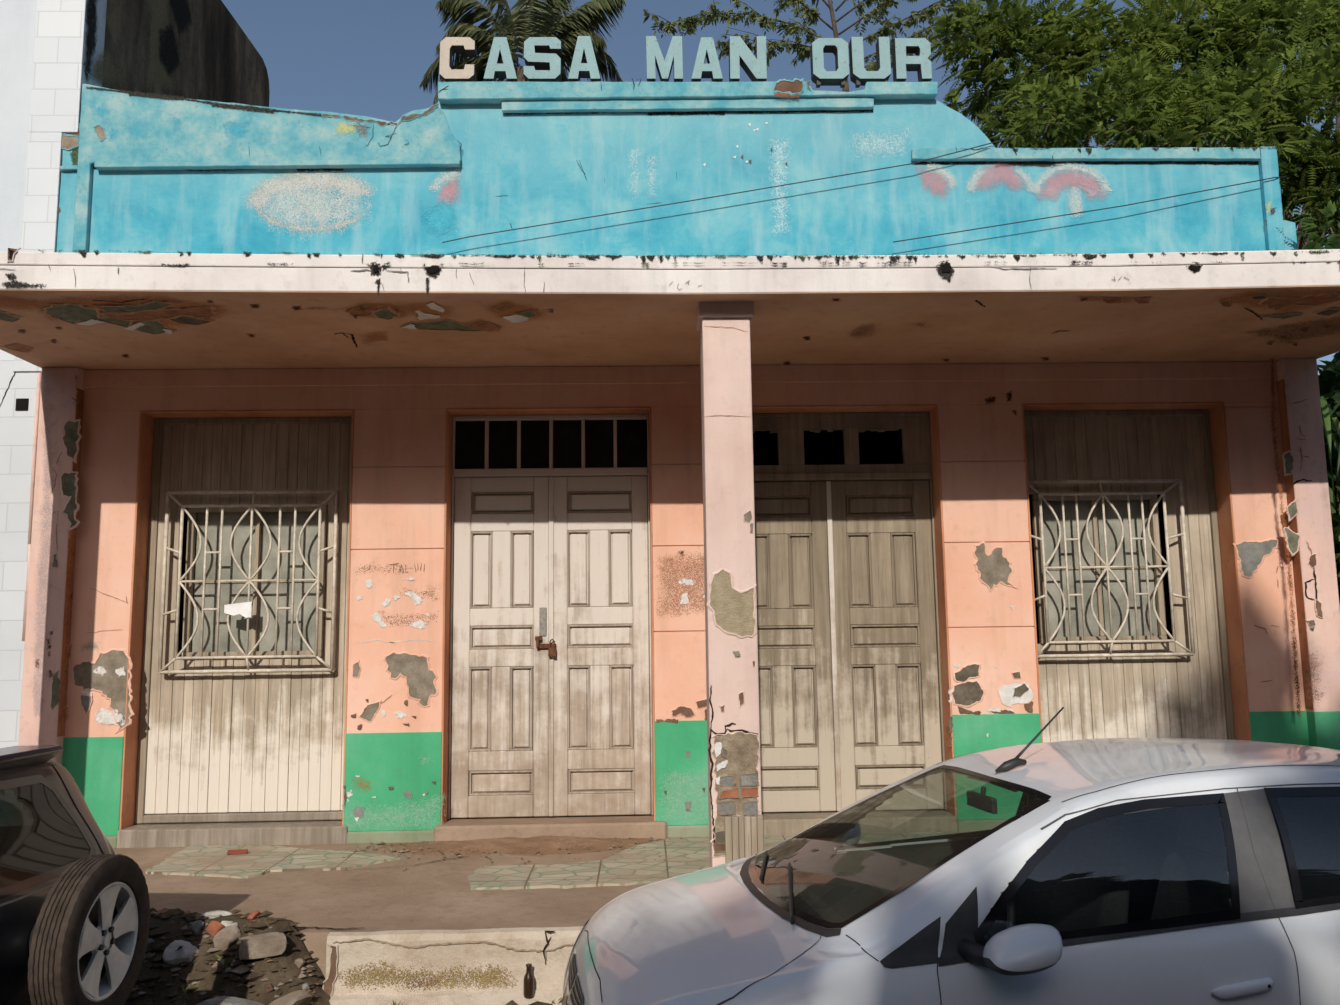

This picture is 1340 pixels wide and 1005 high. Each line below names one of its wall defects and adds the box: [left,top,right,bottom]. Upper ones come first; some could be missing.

spalling [0,294,229,353]
spalling [1215,287,1340,320]
peeling [60,419,82,532]
peeling [973,541,1019,592]
peeling [1233,498,1323,631]
peeling [678,567,757,666]
peeling [51,648,135,734]
peeling [351,650,439,729]
peeling [656,691,745,724]
peeling [948,662,1035,747]
flaking render [685,731,760,858]